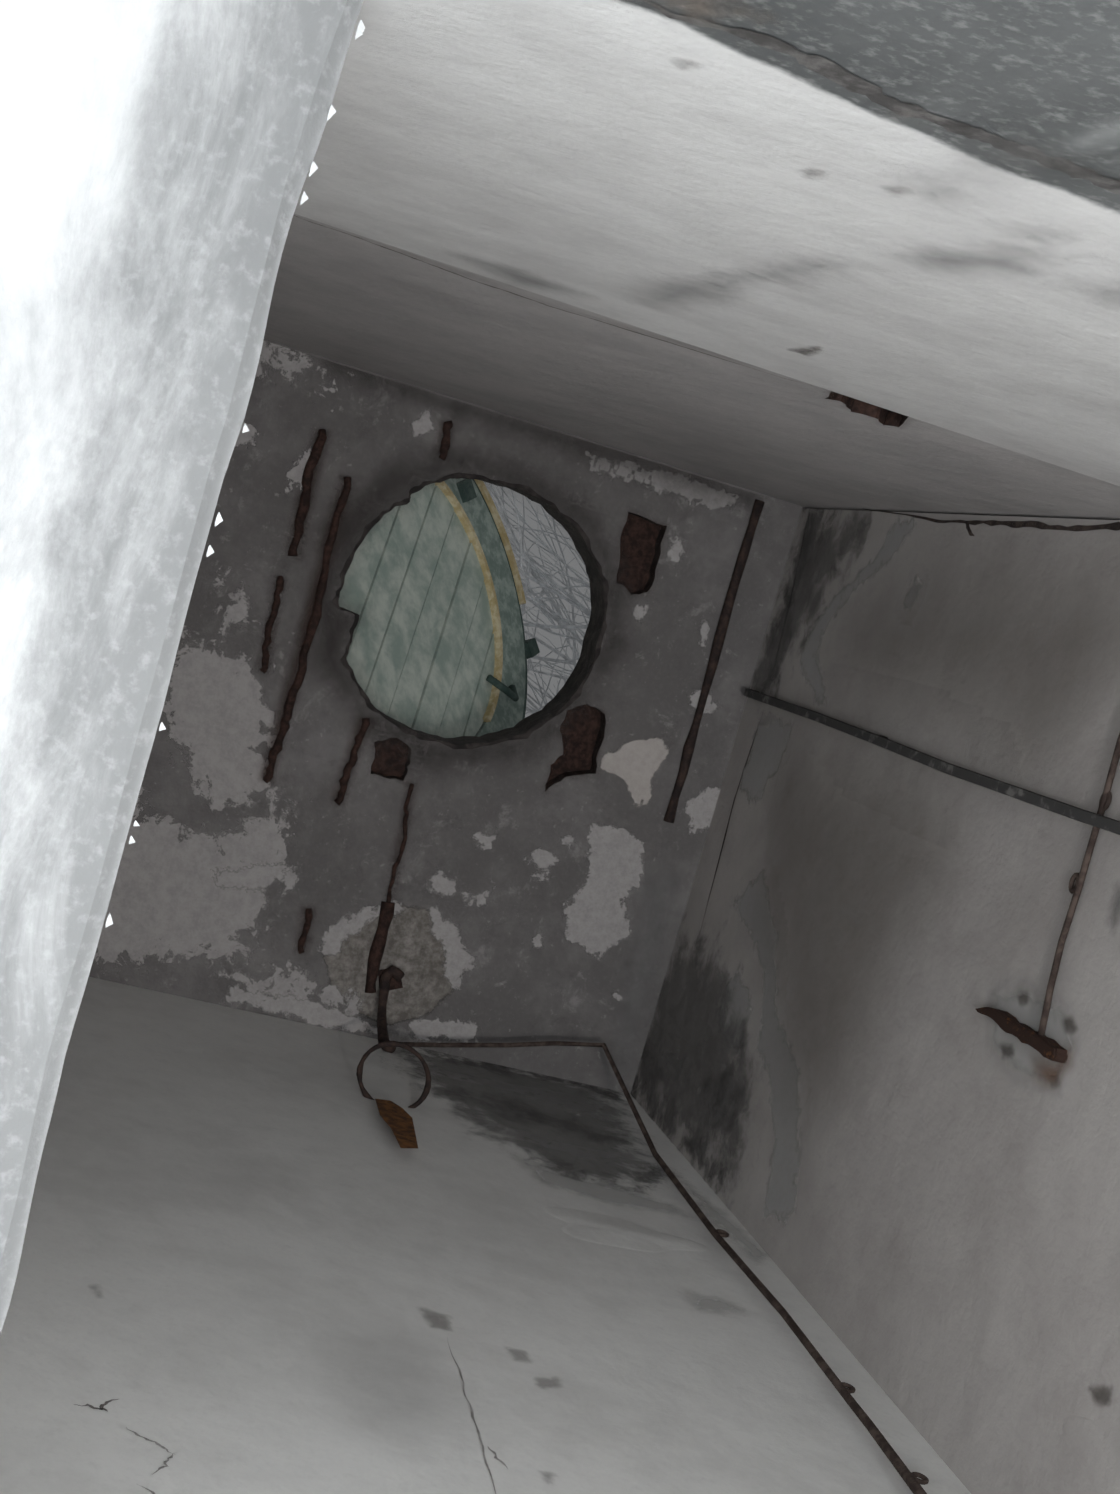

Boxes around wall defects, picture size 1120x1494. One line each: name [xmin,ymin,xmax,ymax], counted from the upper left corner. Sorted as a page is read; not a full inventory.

spalling [300,161,318,205]
peeling [254,341,354,413]
corrosion [288,429,327,556]
corrosion [617,513,661,593]
corrosion [260,477,351,783]
peeling [93,545,496,1043]
corrosion [546,704,601,783]
peeling [600,738,669,807]
peeling [685,787,720,834]
peeling [524,823,645,960]
crack [74,1399,176,1494]
crack [447,1338,508,1494]